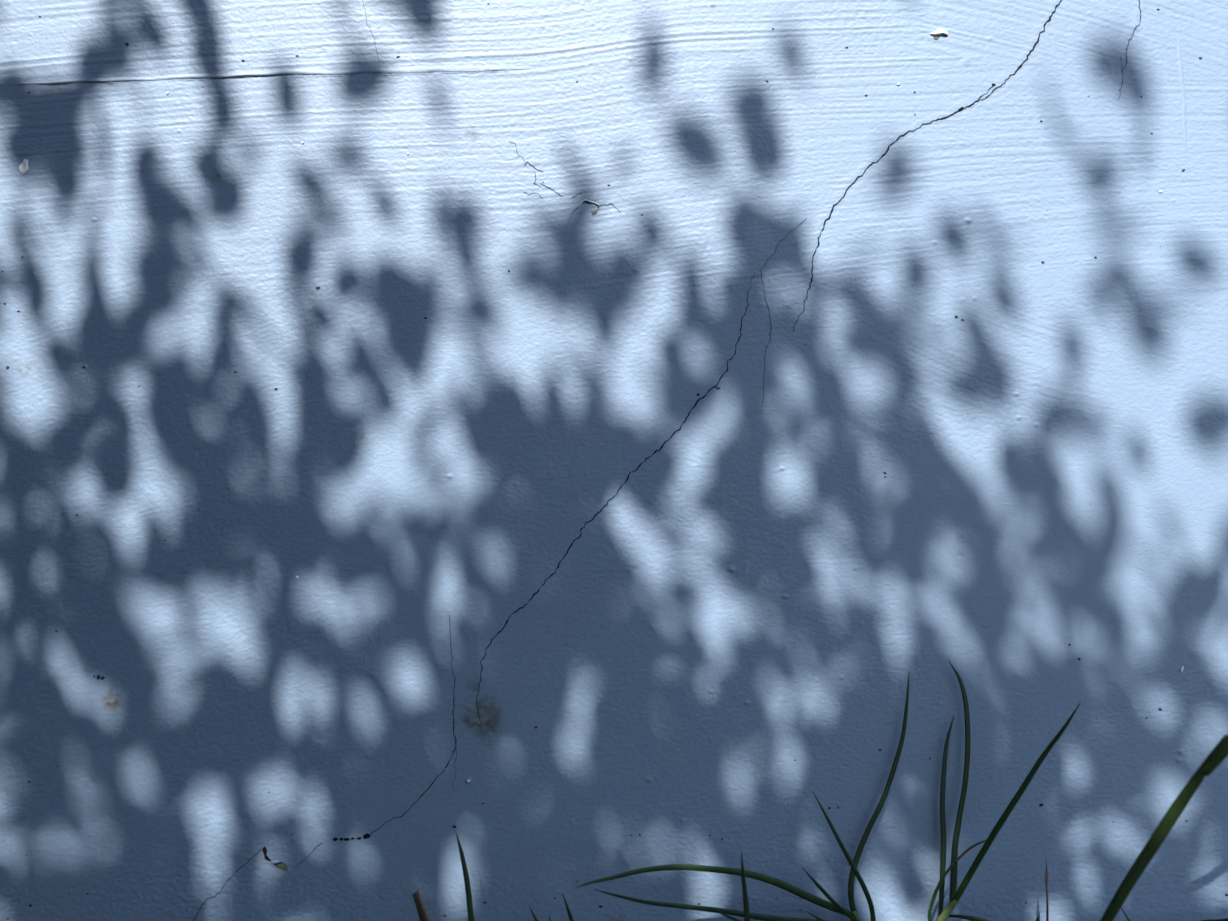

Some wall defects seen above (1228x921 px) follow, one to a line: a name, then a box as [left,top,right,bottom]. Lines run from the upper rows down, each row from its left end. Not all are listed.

crack [1118,1,1141,100]
crack [295,0,1062,868]
crack [193,848,263,921]